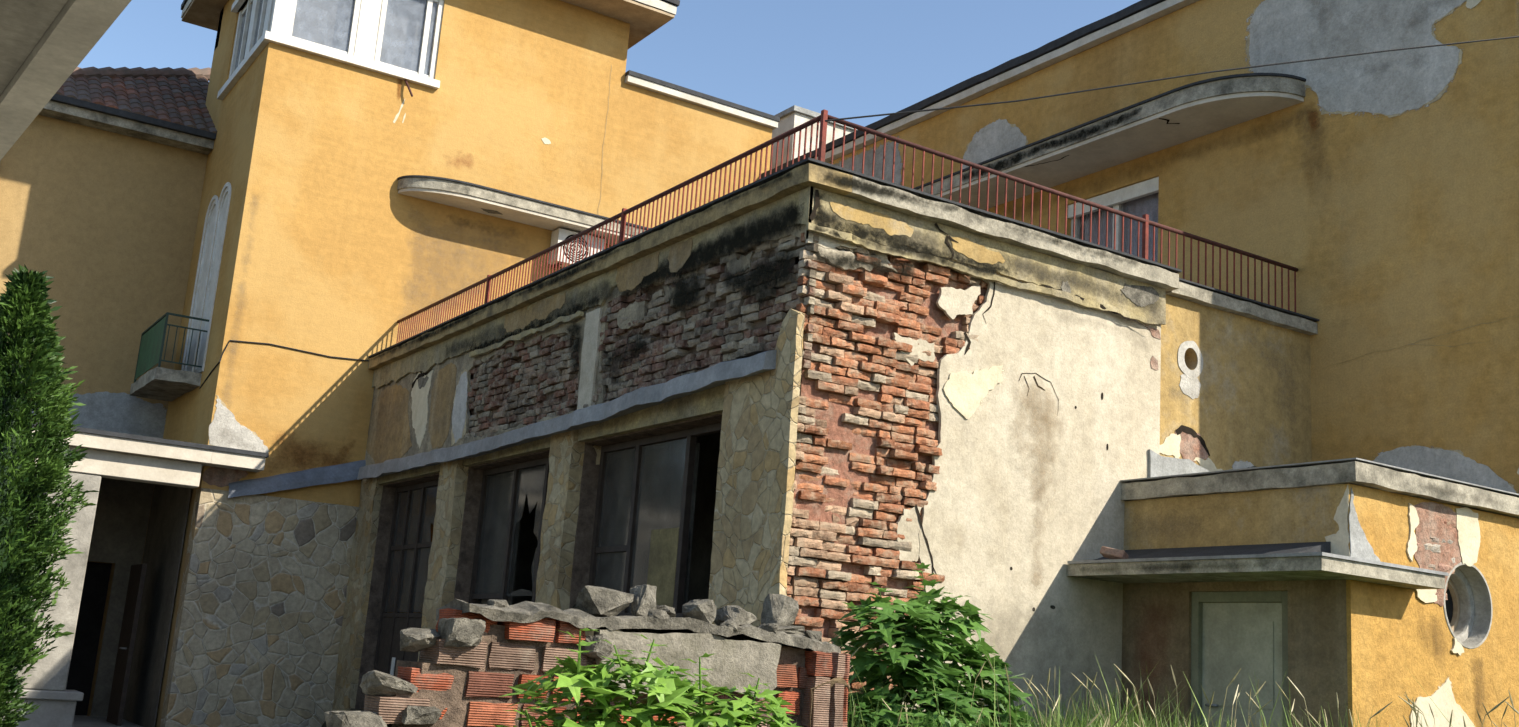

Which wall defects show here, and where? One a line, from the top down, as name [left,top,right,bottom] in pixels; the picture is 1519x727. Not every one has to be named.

flaking render [1244,0,1482,118]
flaking render [962,119,1029,169]
damp [640,196,1008,311]
crack [964,282,995,355]
flaking render [202,467,248,487]
flaking render [208,394,269,453]
peeling [411,369,434,449]
flaking render [446,202,1161,710]
crack [1019,373,1059,416]
flaking render [1160,425,1256,472]
flaking render [1406,502,1481,606]
flaking render [1410,678,1475,727]